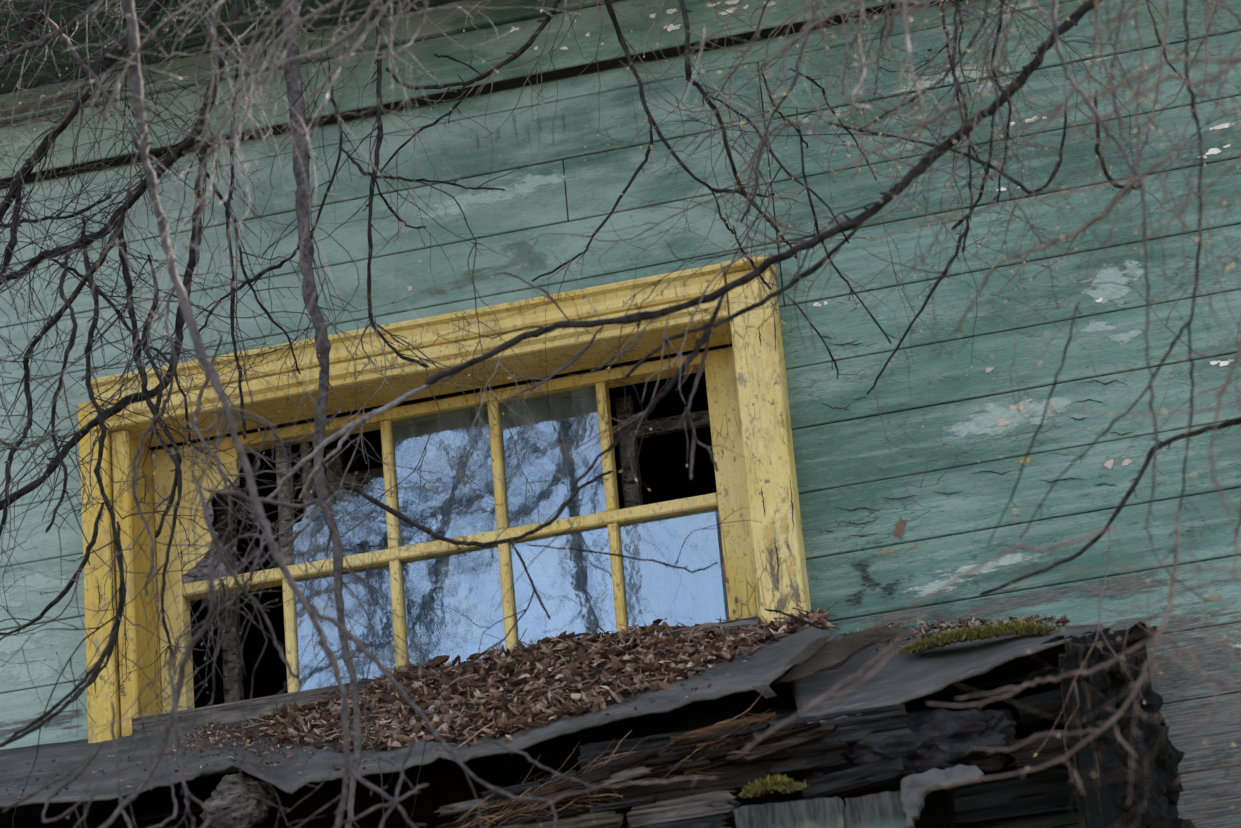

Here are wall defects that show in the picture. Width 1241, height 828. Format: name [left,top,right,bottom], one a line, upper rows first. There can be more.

peeling [1082,260,1144,306]
peeling [1082,321,1142,344]
peeling [948,397,1073,439]
peeling [763,513,801,616]
peeling [832,550,1200,626]
peeling [1103,611,1241,690]